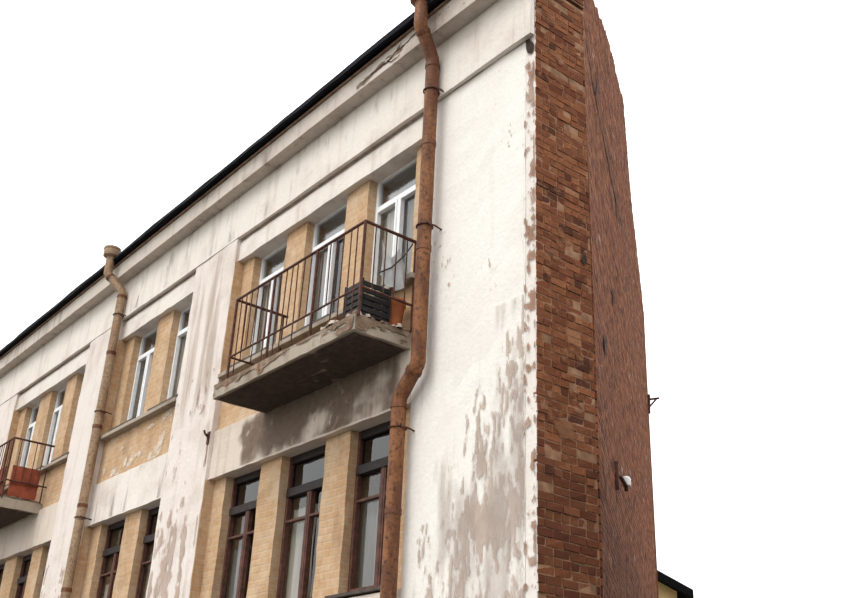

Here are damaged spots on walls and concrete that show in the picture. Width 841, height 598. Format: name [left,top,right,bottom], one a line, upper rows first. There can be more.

flaking render [524,39,535,176]
flaking render [524,187,535,273]
spalling [189,313,410,414]
peeling [418,285,536,598]
peeling [147,497,198,598]